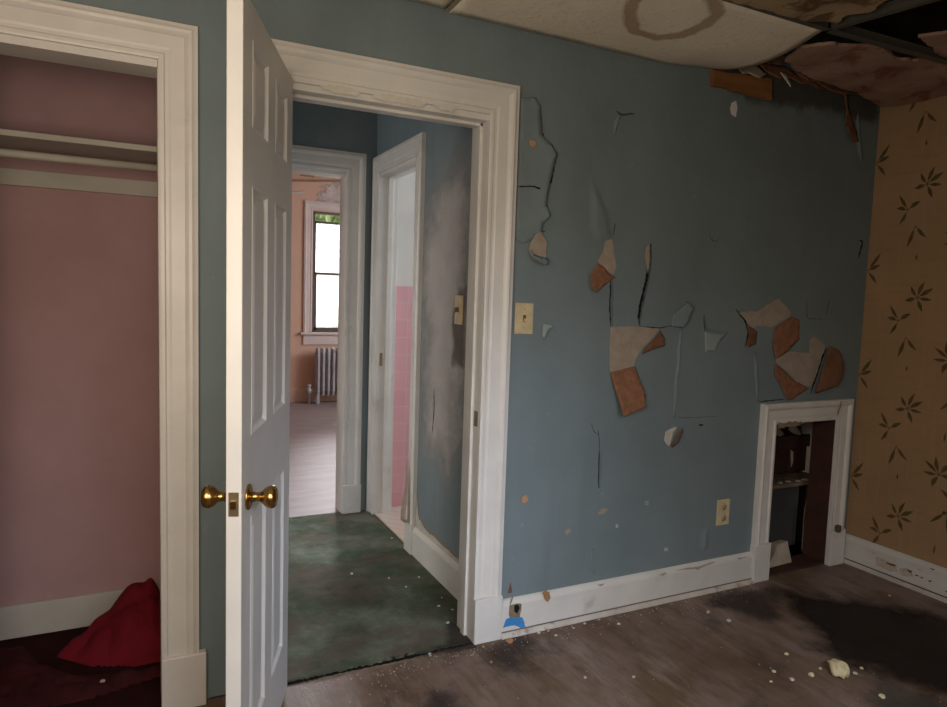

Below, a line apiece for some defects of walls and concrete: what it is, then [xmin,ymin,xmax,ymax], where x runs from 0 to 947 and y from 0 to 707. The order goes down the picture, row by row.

water stain [625,0,724,40]
peeling [598,239,616,275]
crack [607,279,615,326]
peeling [609,326,659,372]
crack [638,244,727,418]
peeling [739,298,791,328]
peeling [776,336,825,387]
crack [591,424,602,488]
peeling [664,427,678,447]
water stain [715,591,947,693]